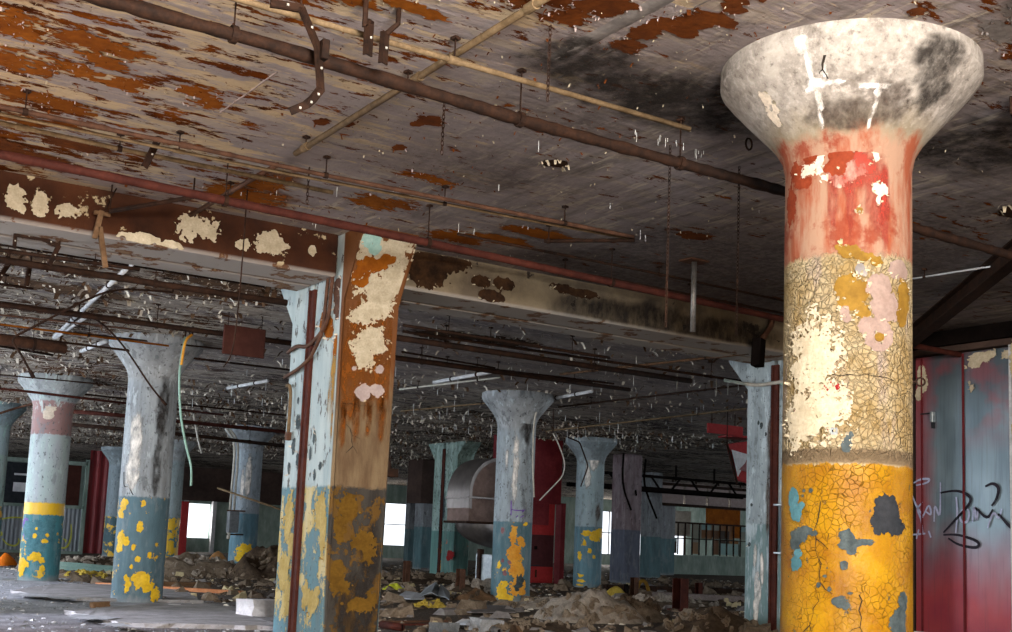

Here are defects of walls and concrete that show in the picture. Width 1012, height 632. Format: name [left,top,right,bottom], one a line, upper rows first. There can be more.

damp [795,35,962,129]
peeling [379,107,455,154]
peeling [769,151,858,232]
peeling [871,180,889,206]
peeling [311,192,580,356]
peeling [782,238,912,457]
peeling [20,515,57,560]
peeling [788,487,818,571]
crack [803,501,832,632]
peeling [814,575,853,610]
peeling [837,491,906,570]
peeling [888,591,908,632]